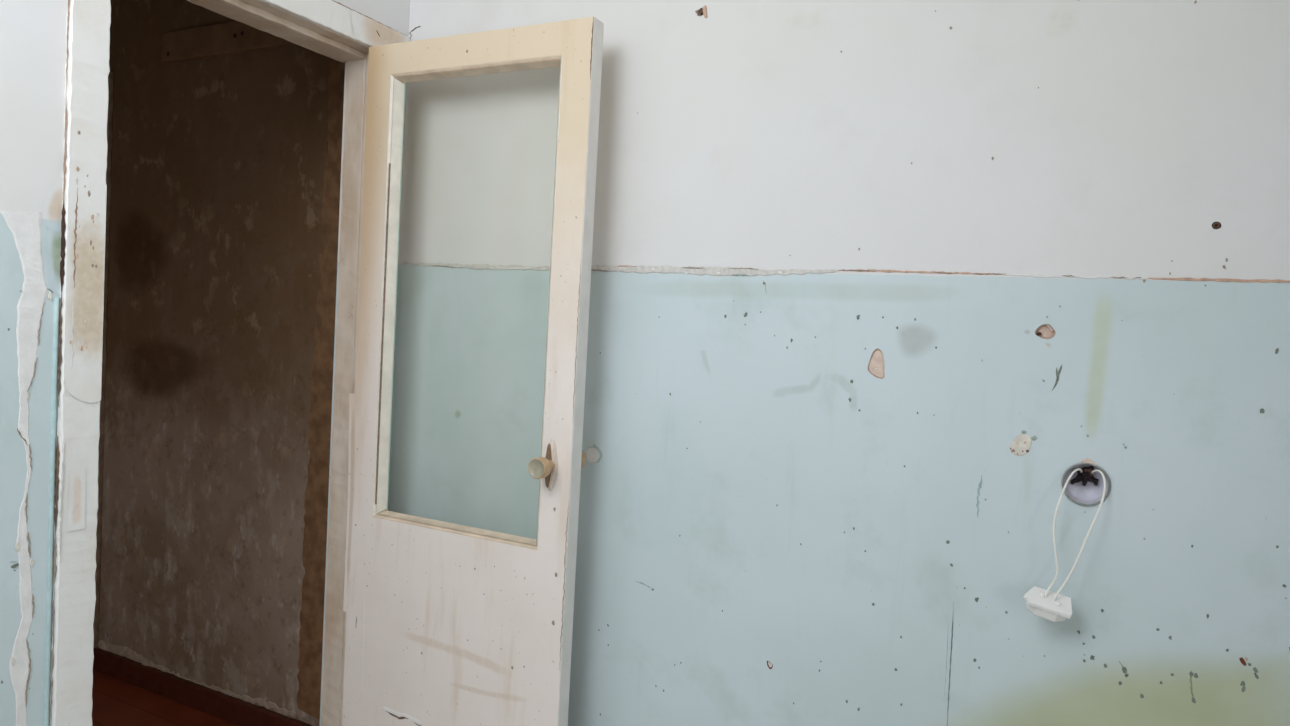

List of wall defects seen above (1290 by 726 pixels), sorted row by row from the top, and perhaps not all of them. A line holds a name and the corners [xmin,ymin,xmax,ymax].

water stain [43,167,247,422]
flaking render [1018,305,1061,352]
flaking render [865,348,885,379]
peeling [1010,430,1037,456]
peeling [0,210,53,726]